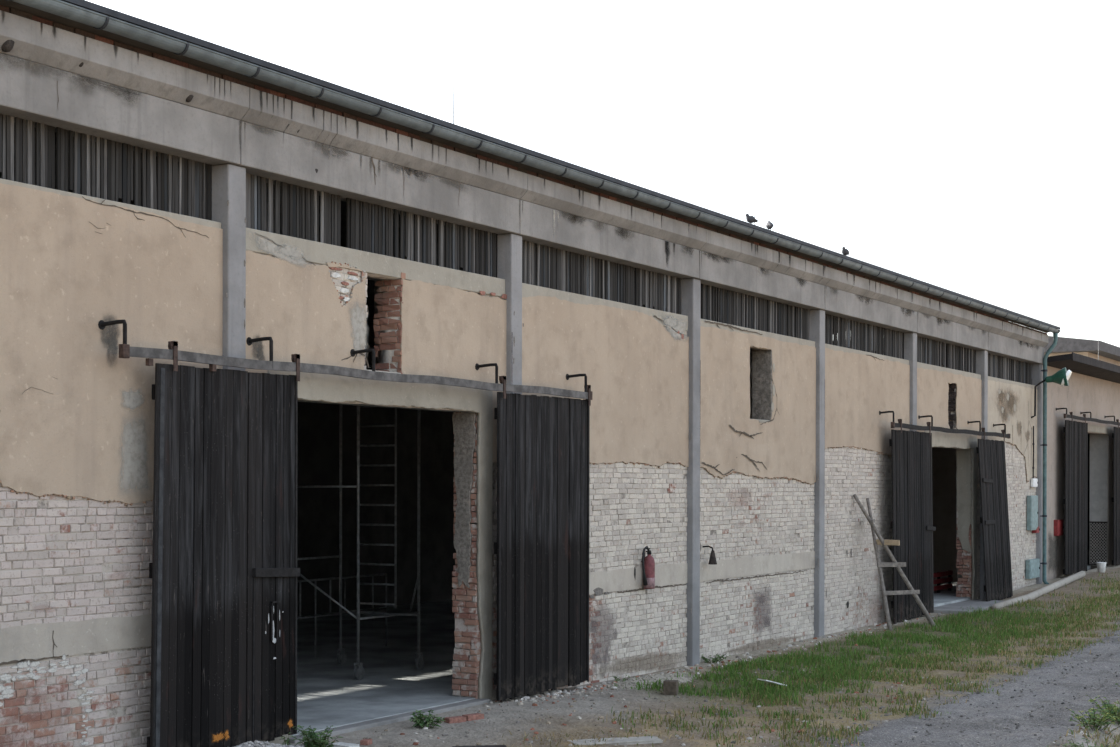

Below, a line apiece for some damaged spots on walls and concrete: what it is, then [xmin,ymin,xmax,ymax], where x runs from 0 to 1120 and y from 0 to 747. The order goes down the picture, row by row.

crack [82,196,209,238]
peeling [326,261,368,318]
crack [702,376,780,475]
peeling [0,481,153,628]
peeling [549,446,893,691]
peeling [0,648,151,747]